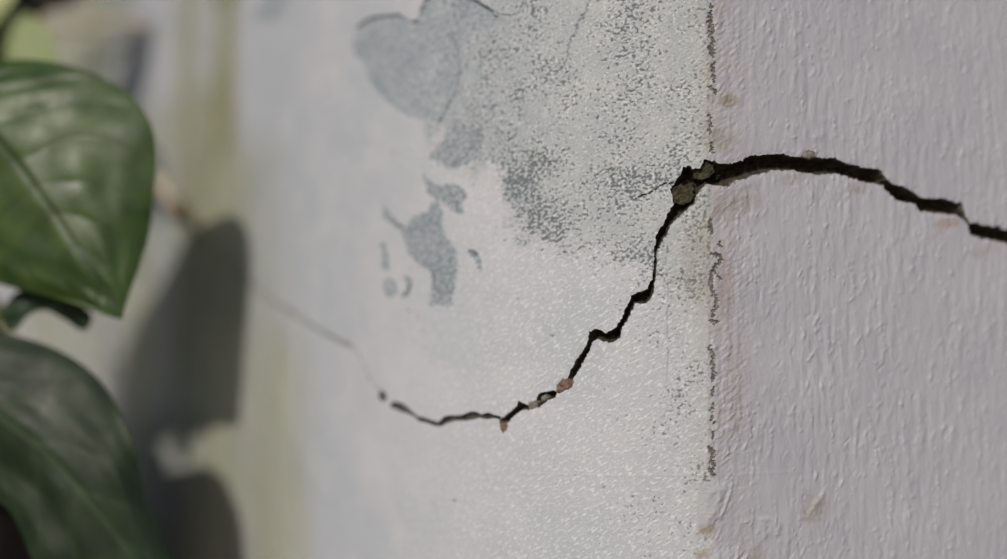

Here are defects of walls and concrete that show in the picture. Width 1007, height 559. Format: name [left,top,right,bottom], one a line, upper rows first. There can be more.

peeling [352,0,523,170]
peeling [380,174,482,308]
crack [237,0,1007,477]